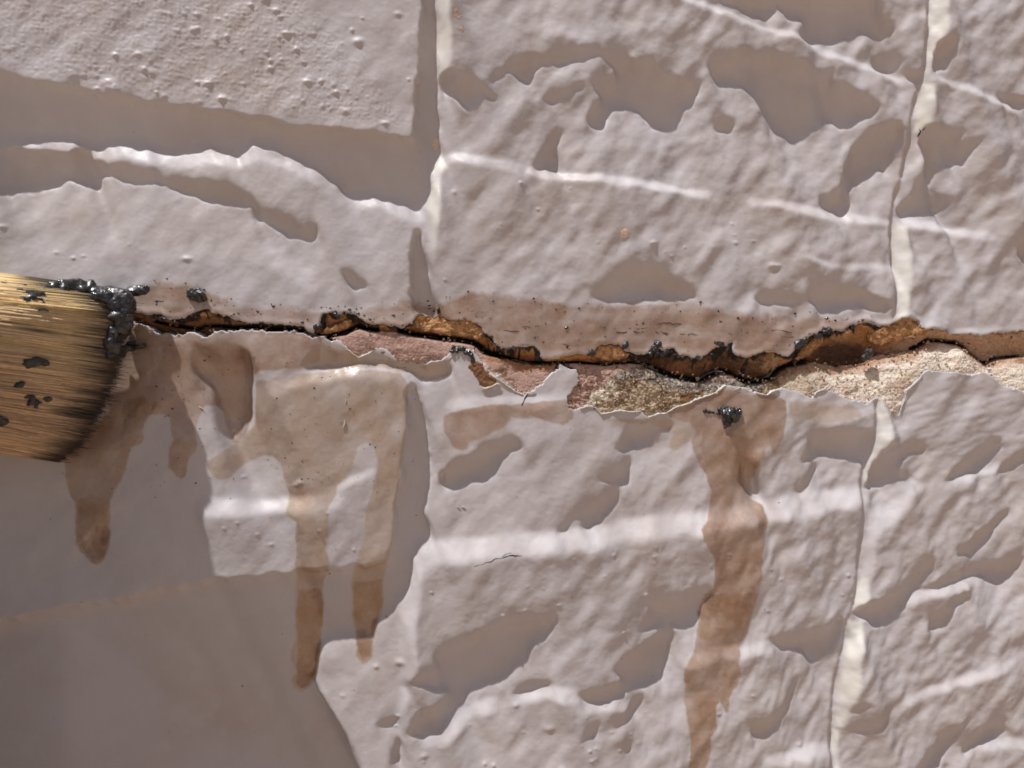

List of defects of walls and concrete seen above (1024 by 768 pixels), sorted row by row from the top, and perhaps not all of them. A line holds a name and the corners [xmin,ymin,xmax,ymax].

crack [132,309,1024,406]
peeling [329,328,1024,418]